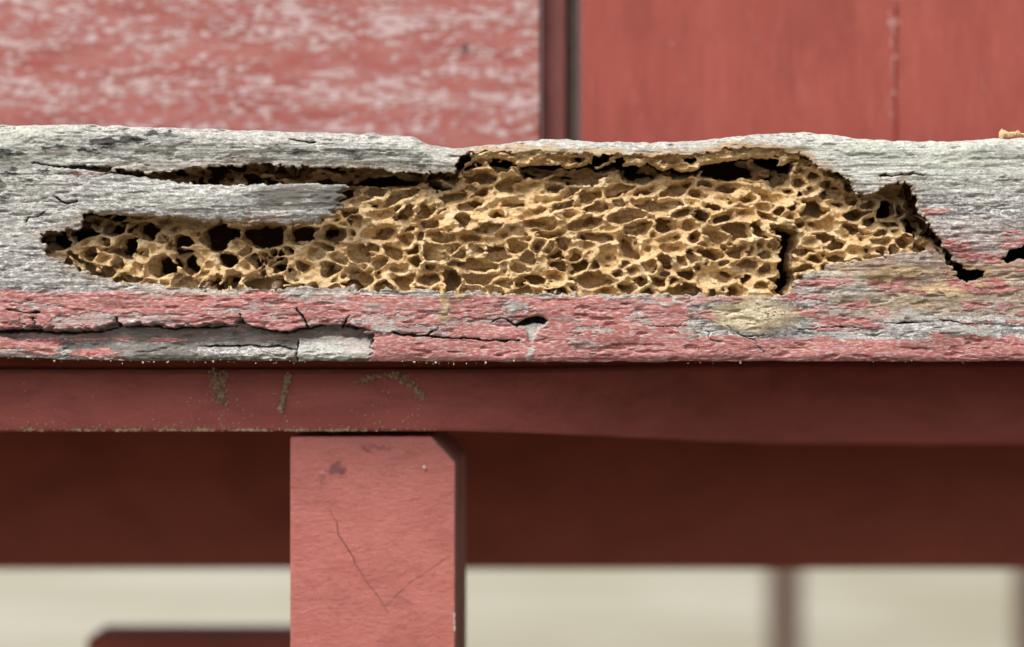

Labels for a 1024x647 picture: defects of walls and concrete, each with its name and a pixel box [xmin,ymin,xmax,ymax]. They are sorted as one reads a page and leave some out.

crack [32,162,112,173]
peeling [928,230,1024,264]
crack [0,308,362,359]
peeling [0,271,1024,362]
crack [330,511,451,614]